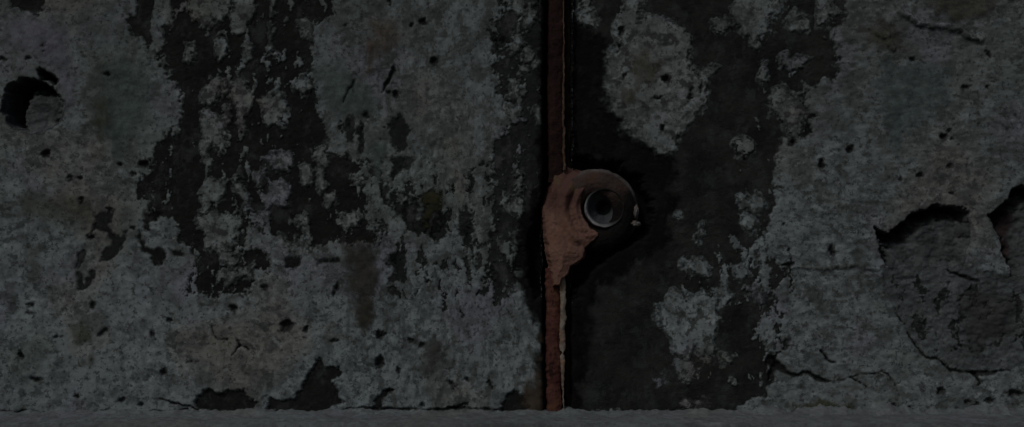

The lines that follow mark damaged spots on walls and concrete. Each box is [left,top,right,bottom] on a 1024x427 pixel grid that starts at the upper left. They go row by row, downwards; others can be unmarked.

spalling [0,69,66,134]
leakage [343,241,378,329]
spalling [873,185,1024,357]
crack [947,269,979,281]
peeling [196,358,342,412]
crack [765,350,892,387]
crack [897,314,1003,385]